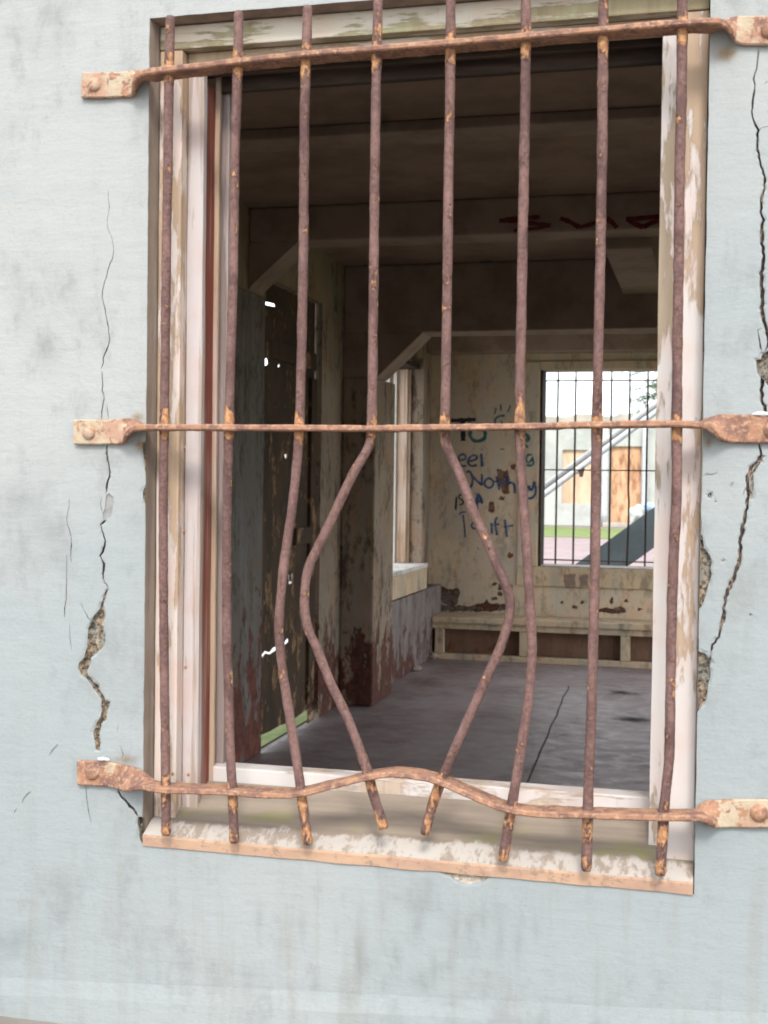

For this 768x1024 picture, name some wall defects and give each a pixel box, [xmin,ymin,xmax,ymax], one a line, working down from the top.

crack [751,50,768,412]
crack [101,190,114,420]
crack [64,445,124,757]
peeling [441,582,513,612]
peeling [563,574,589,588]
peeling [599,597,642,614]
spalling [699,534,724,609]
crack [711,443,763,652]
spalling [697,652,711,712]
crack [526,686,569,783]
crack [118,789,145,843]
peeling [442,872,488,884]